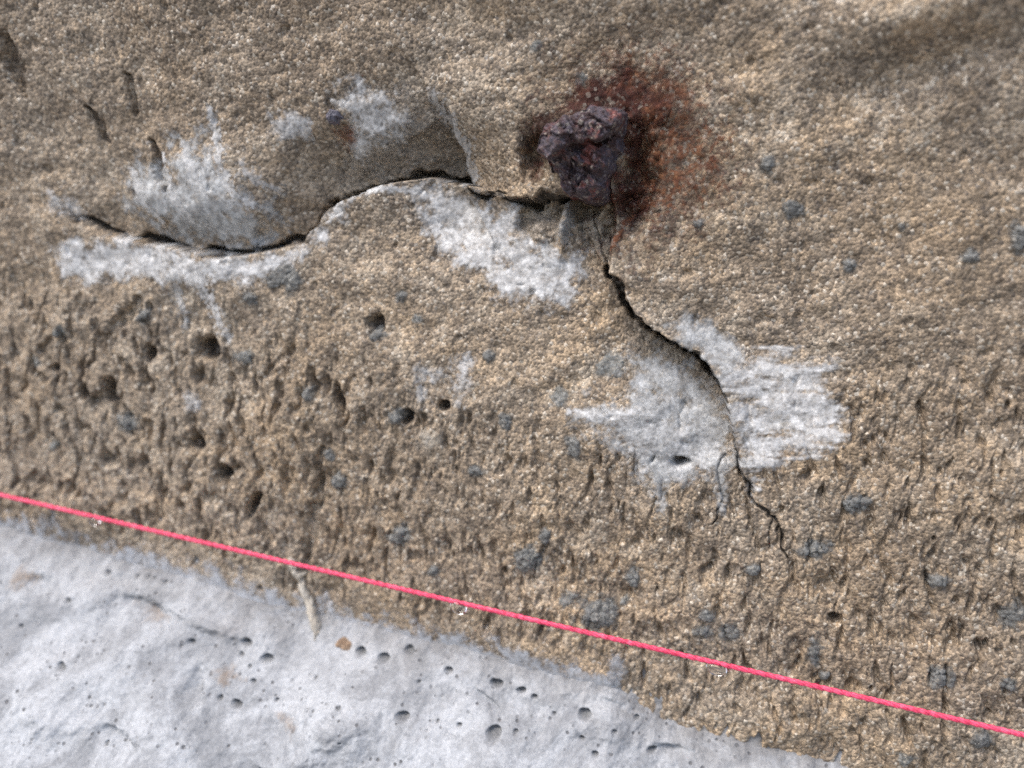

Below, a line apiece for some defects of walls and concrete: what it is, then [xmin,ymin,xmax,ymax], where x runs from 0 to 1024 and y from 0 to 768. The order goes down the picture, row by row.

crack [71,203,307,258]
damp [47,106,587,345]
efflorescence [330,75,412,159]
corrosion [531,54,733,251]
crack [398,172,788,557]
efflorescence [566,314,849,511]